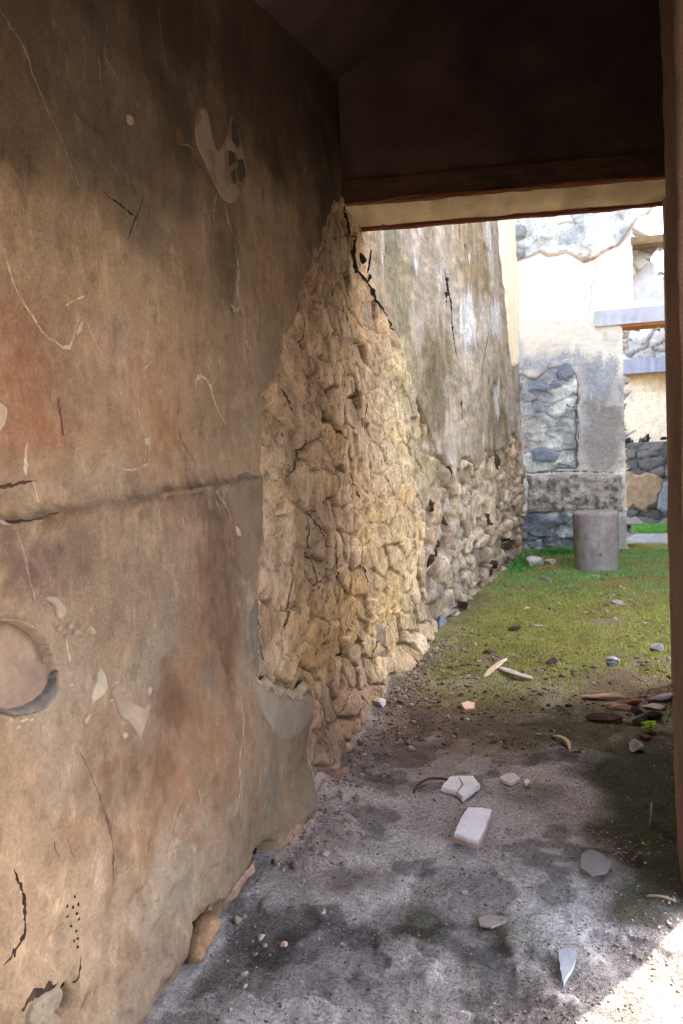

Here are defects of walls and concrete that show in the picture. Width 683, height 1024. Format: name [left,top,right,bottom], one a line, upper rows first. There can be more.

crack [0,8,144,239]
peeling [176,107,246,203]
crack [344,206,394,330]
crack [445,272,457,356]
spalling [515,207,654,263]
crack [0,480,37,489]
spalling [256,194,580,792]
spalling [198,810,317,916]
crack [4,869,27,965]
crack [22,957,82,1012]